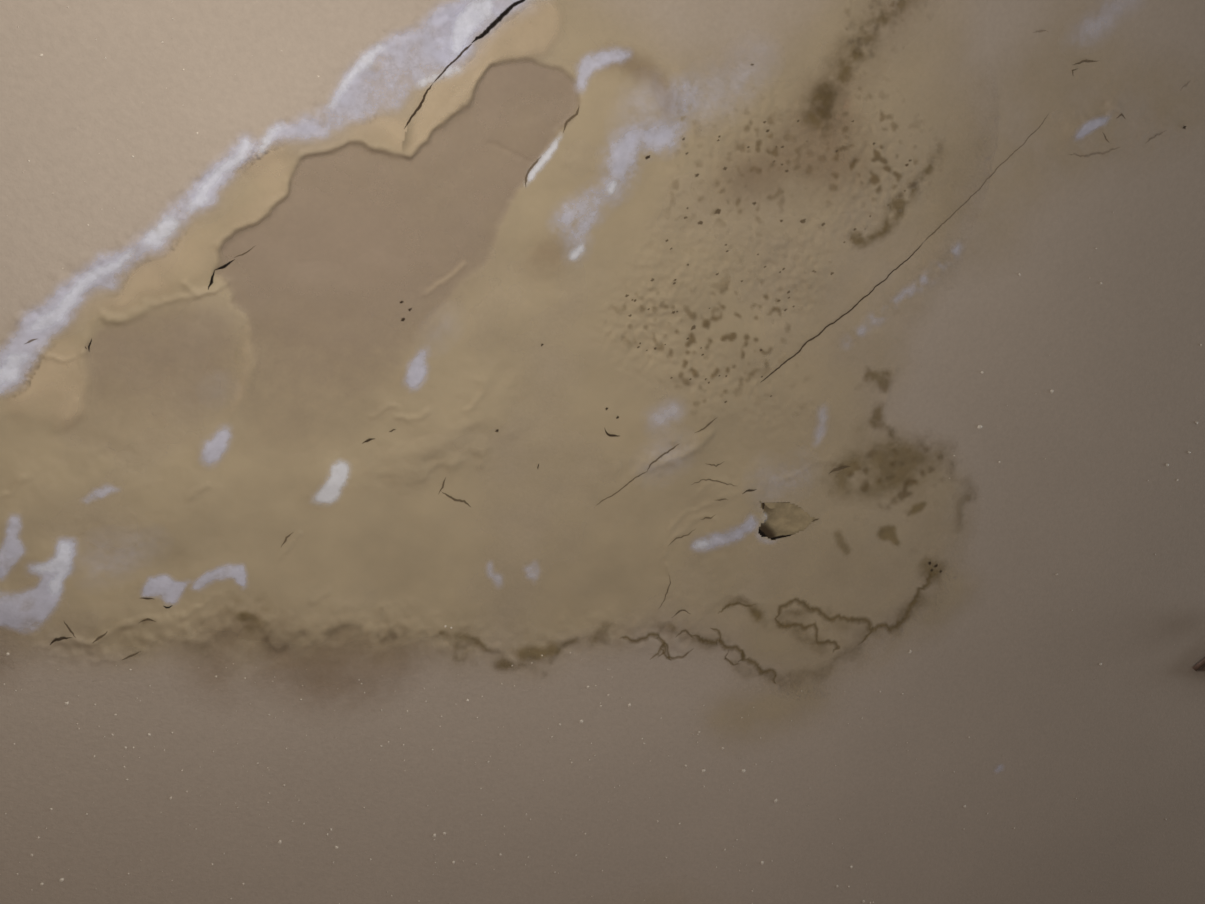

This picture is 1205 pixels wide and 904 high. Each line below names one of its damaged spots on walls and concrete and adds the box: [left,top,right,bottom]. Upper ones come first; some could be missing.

crack [404,0,525,129]
peeling [192,131,281,205]
crack [760,115,1048,383]
peeling [0,256,122,387]
peeling [316,463,348,502]
crack [597,418,716,505]
peeling [0,544,73,626]
peeling [145,578,183,601]
damp [775,575,931,652]
damp [623,629,776,683]